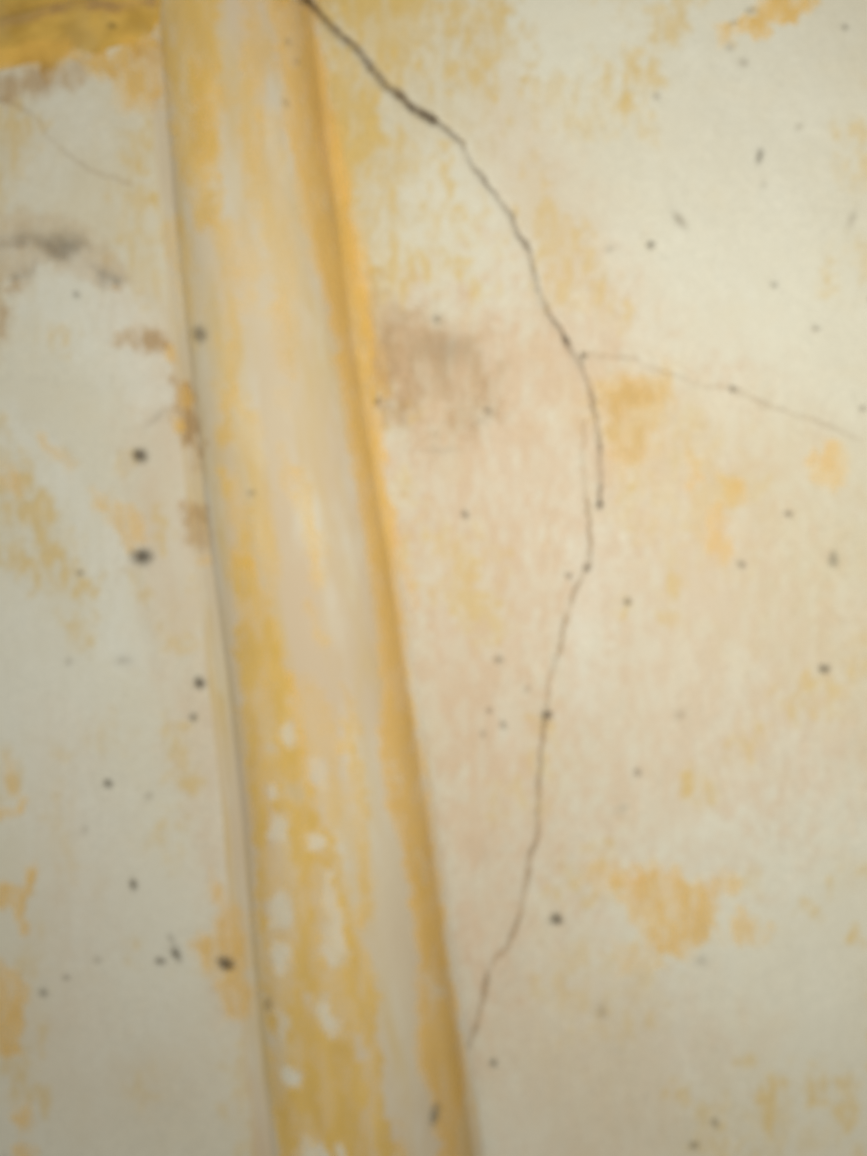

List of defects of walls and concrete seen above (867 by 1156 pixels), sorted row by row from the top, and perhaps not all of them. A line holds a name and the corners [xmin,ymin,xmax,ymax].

crack [306,0,435,122]